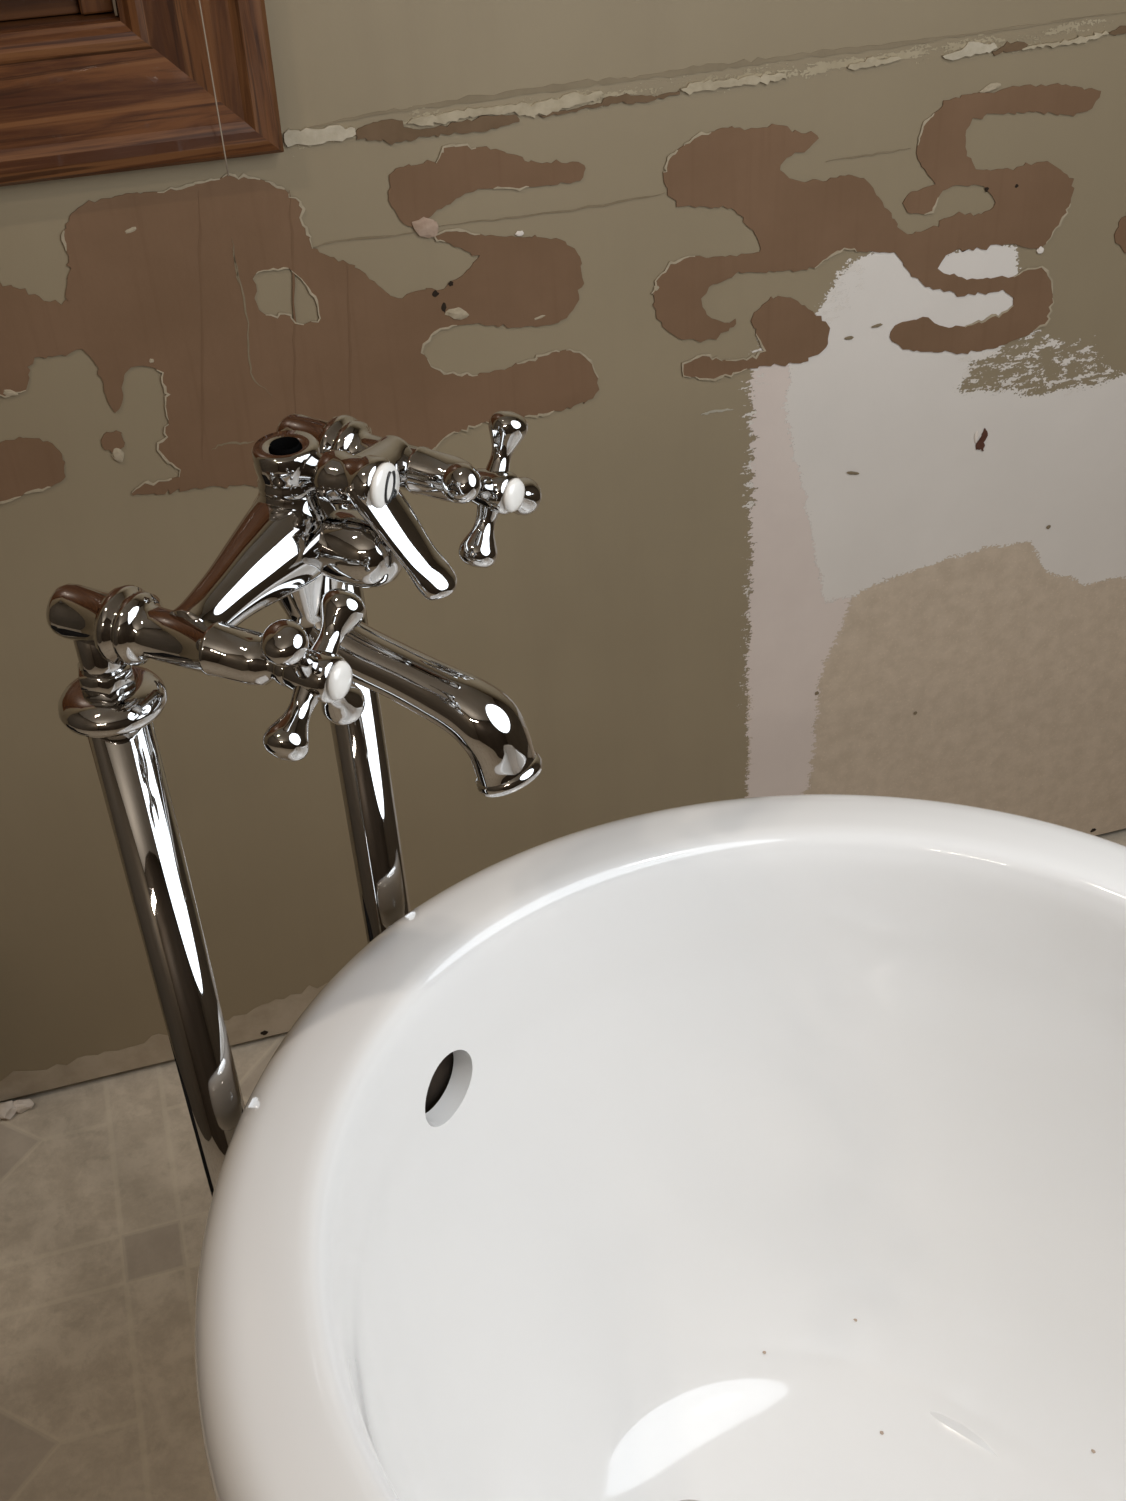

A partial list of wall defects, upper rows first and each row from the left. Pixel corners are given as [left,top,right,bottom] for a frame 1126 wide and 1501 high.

peeling [0,143,599,504]
peeling [651,82,1101,381]
spalling [974,428,988,451]
peeling [1114,216,1126,253]
peeling [802,540,1126,836]